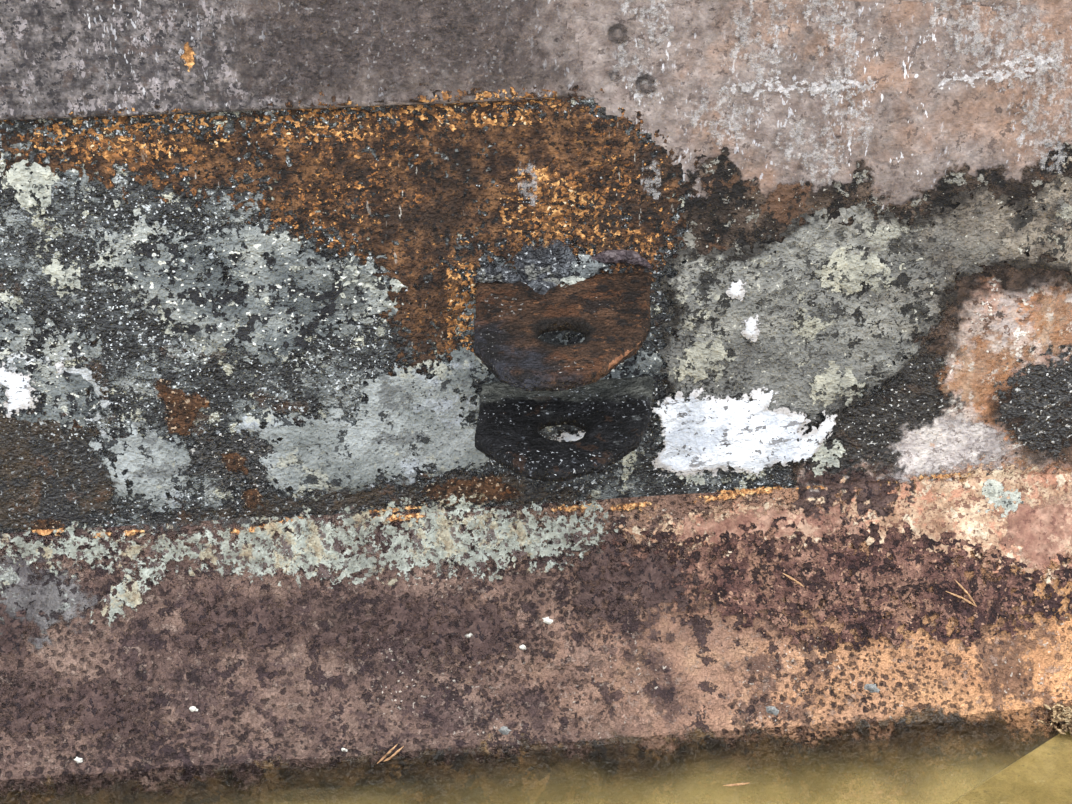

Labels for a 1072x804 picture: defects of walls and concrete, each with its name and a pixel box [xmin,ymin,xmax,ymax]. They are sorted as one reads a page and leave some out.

corrosion [0,78,707,378]
damp [677,141,1072,258]
damp [0,350,184,759]
damp [186,426,276,495]
damp [168,582,528,689]
damp [559,251,1072,651]